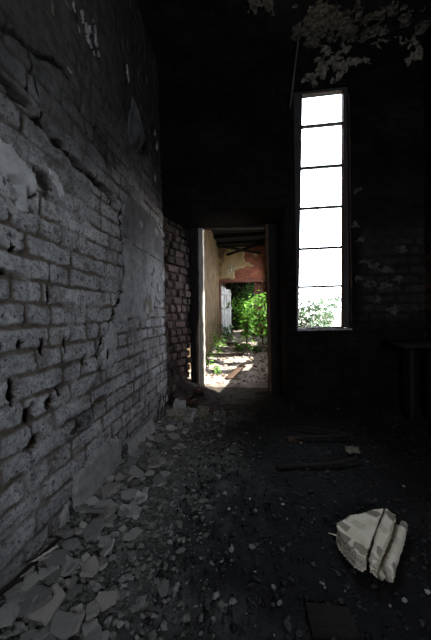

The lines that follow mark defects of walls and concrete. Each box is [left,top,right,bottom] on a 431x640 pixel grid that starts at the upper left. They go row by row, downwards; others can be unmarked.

peeling [65,0,100,57]
peeling [247,0,275,17]
peeling [290,0,431,88]
peeling [0,138,64,224]
spalling [47,137,99,186]
crack [95,205,159,360]
peeling [218,247,258,280]
spalling [22,409,34,424]
peeling [59,437,122,528]